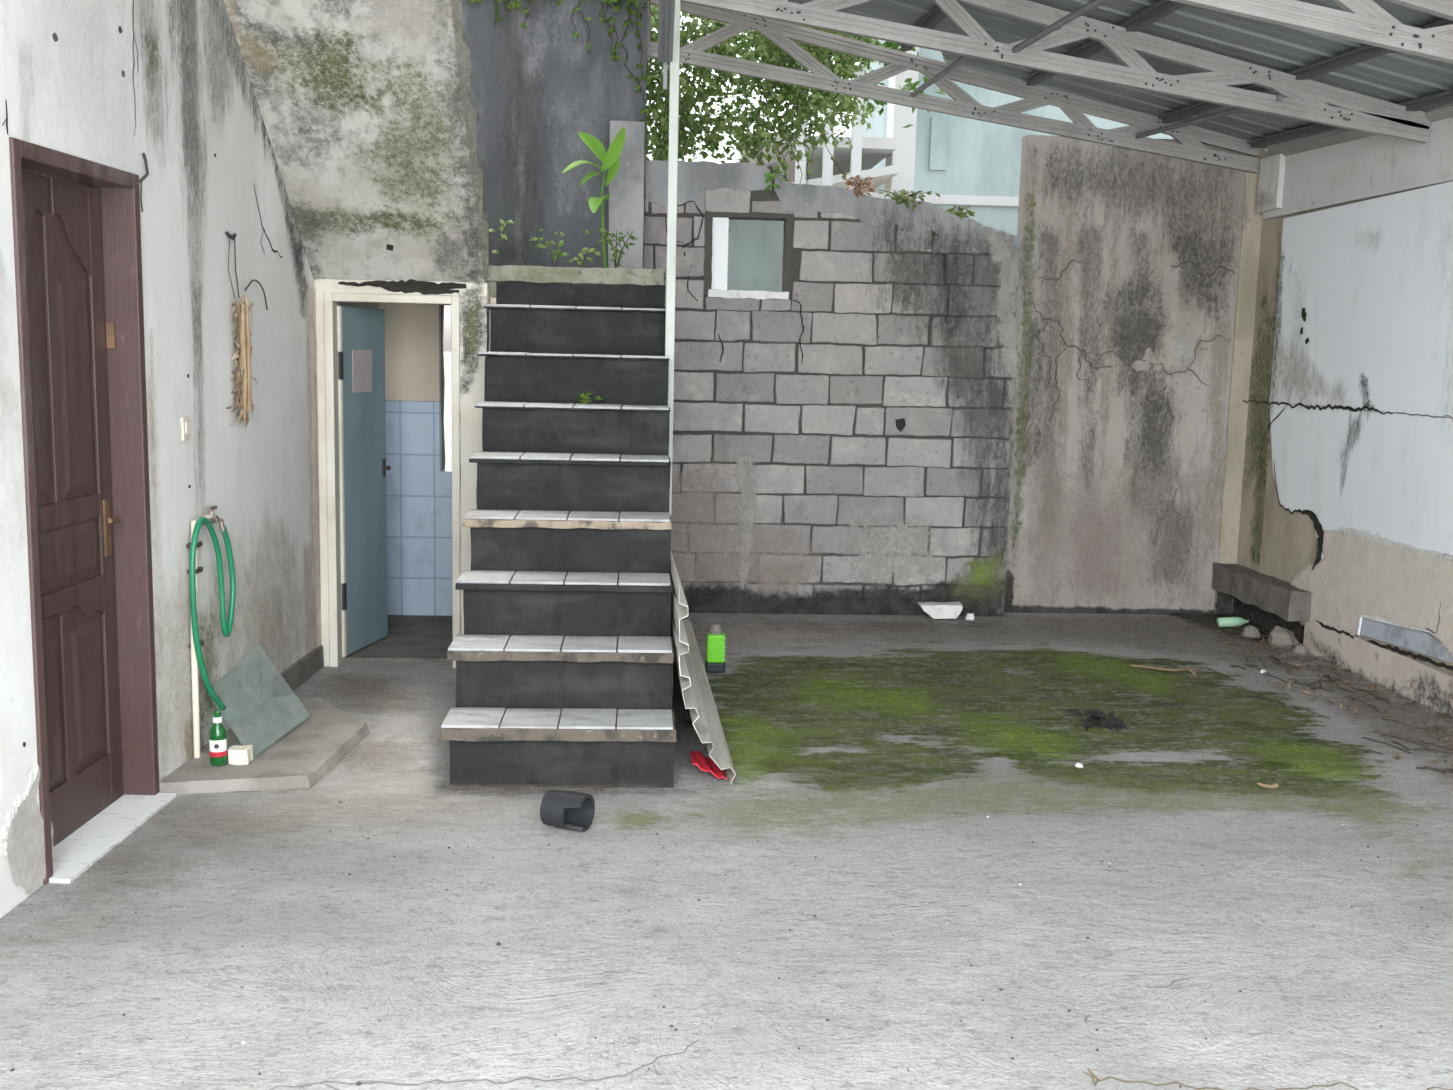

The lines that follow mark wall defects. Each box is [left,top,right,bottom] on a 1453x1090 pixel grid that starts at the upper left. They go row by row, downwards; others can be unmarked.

leakage [502,0,602,259]
leakage [140,0,487,485]
leakage [671,150,1337,664]
crack [1243,399,1453,427]
leakage [1342,376,1372,464]
peeling [1291,528,1453,654]
crack [1315,602,1453,671]
leakage [1392,677,1453,718]
flaking render [0,765,54,894]
crack [269,1040,699,1090]
crack [1082,1069,1359,1090]